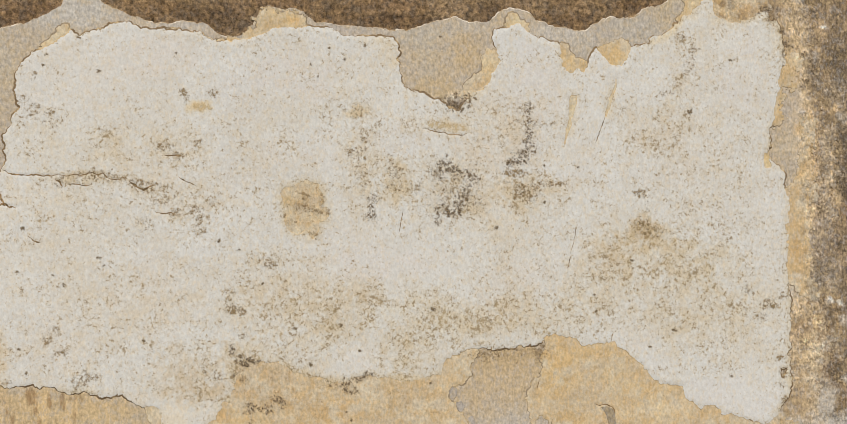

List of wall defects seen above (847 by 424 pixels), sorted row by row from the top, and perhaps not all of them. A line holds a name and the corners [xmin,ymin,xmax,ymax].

spalling [0,0,703,172]
crack [4,170,154,191]
flaking render [208,0,847,424]